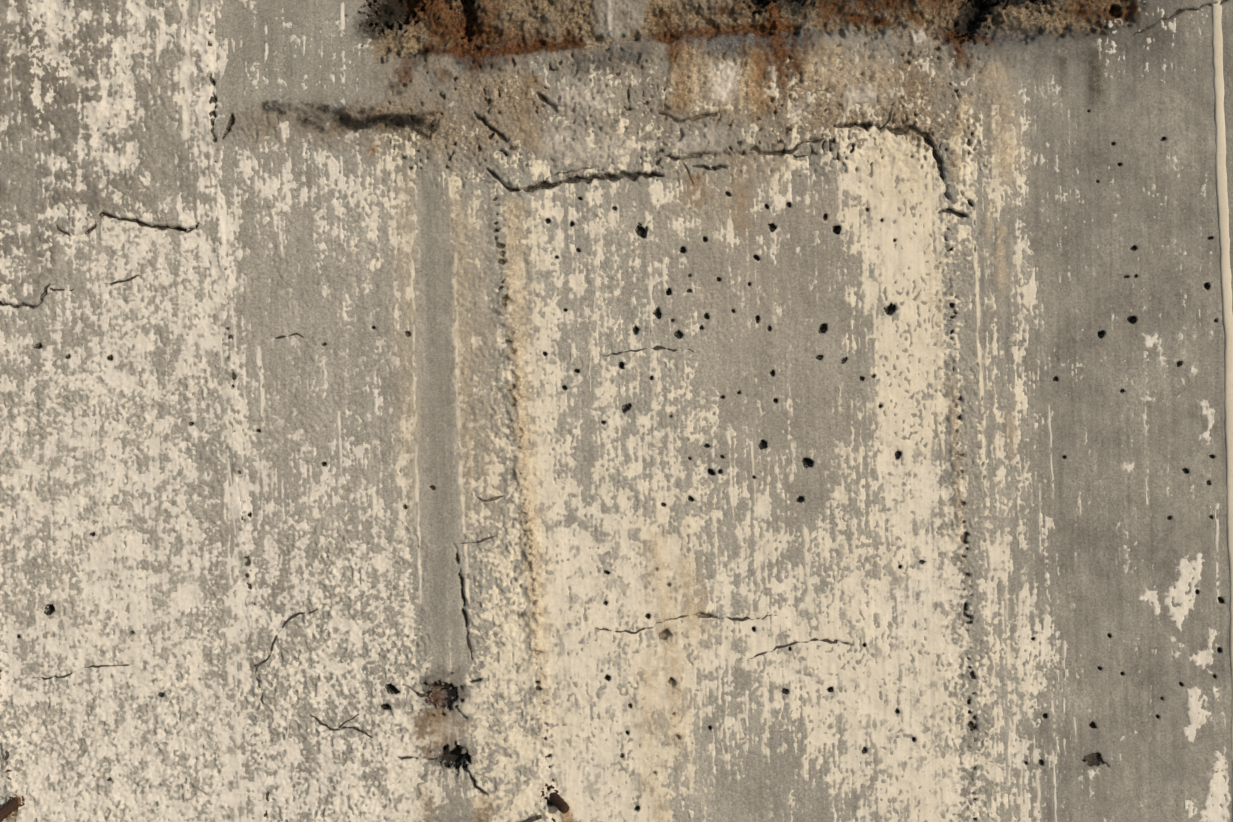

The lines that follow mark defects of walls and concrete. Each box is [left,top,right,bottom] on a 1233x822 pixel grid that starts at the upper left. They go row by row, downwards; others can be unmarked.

rust [408,0,584,68]
crack [1133,0,1229,36]
crack [537,93,557,113]
crack [810,80,872,96]
leakage [306,105,439,138]
crack [475,111,724,192]
crack [749,107,973,218]
crack [56,212,202,236]
crack [105,275,139,285]
crack [0,285,75,309]